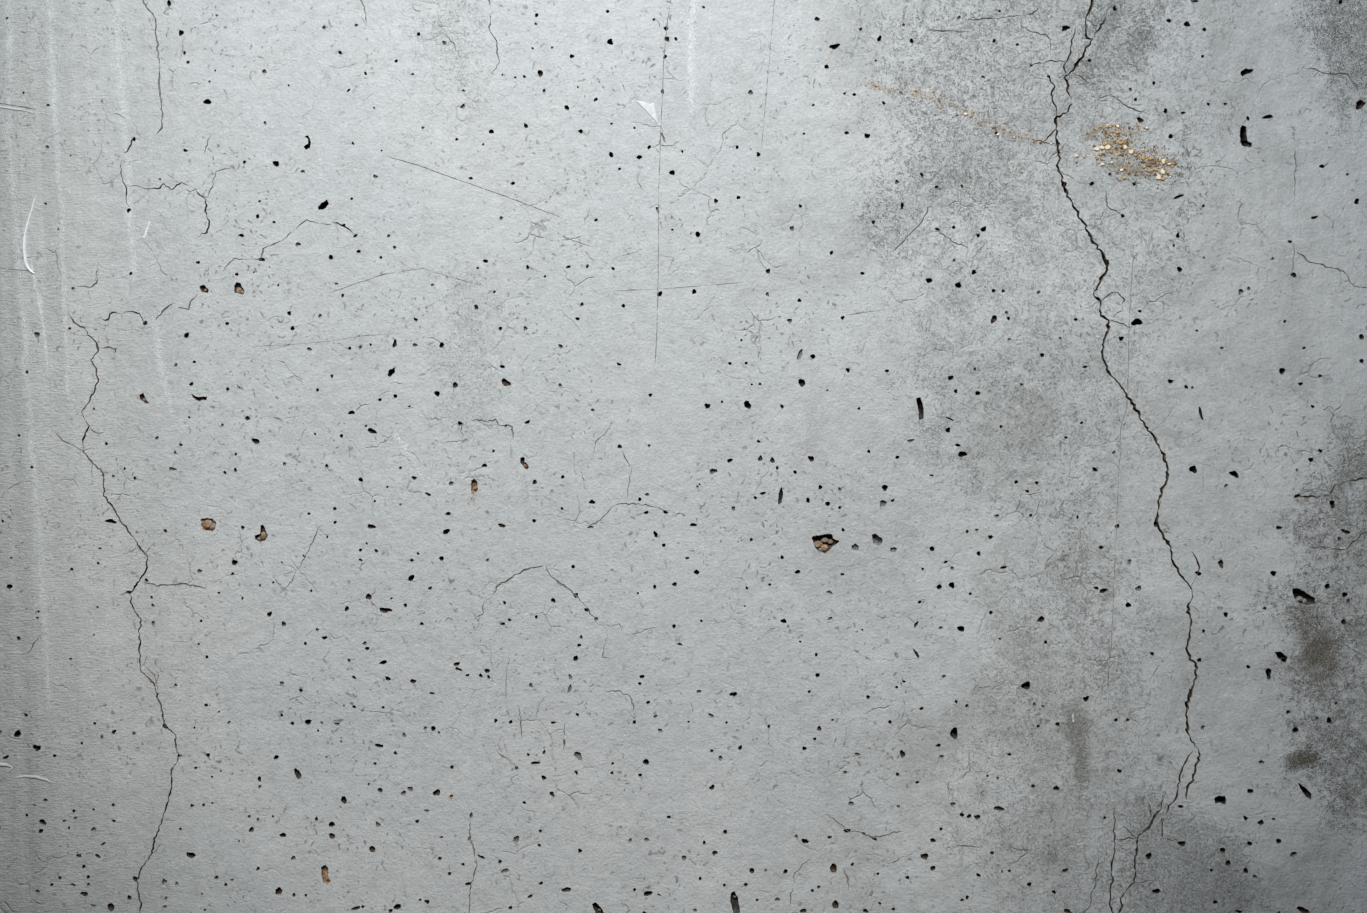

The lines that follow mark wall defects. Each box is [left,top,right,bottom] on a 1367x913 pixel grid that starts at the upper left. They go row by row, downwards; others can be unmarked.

crack [55,269,206,913]
crack [928,0,1203,913]
corrosion [1075,120,1189,189]